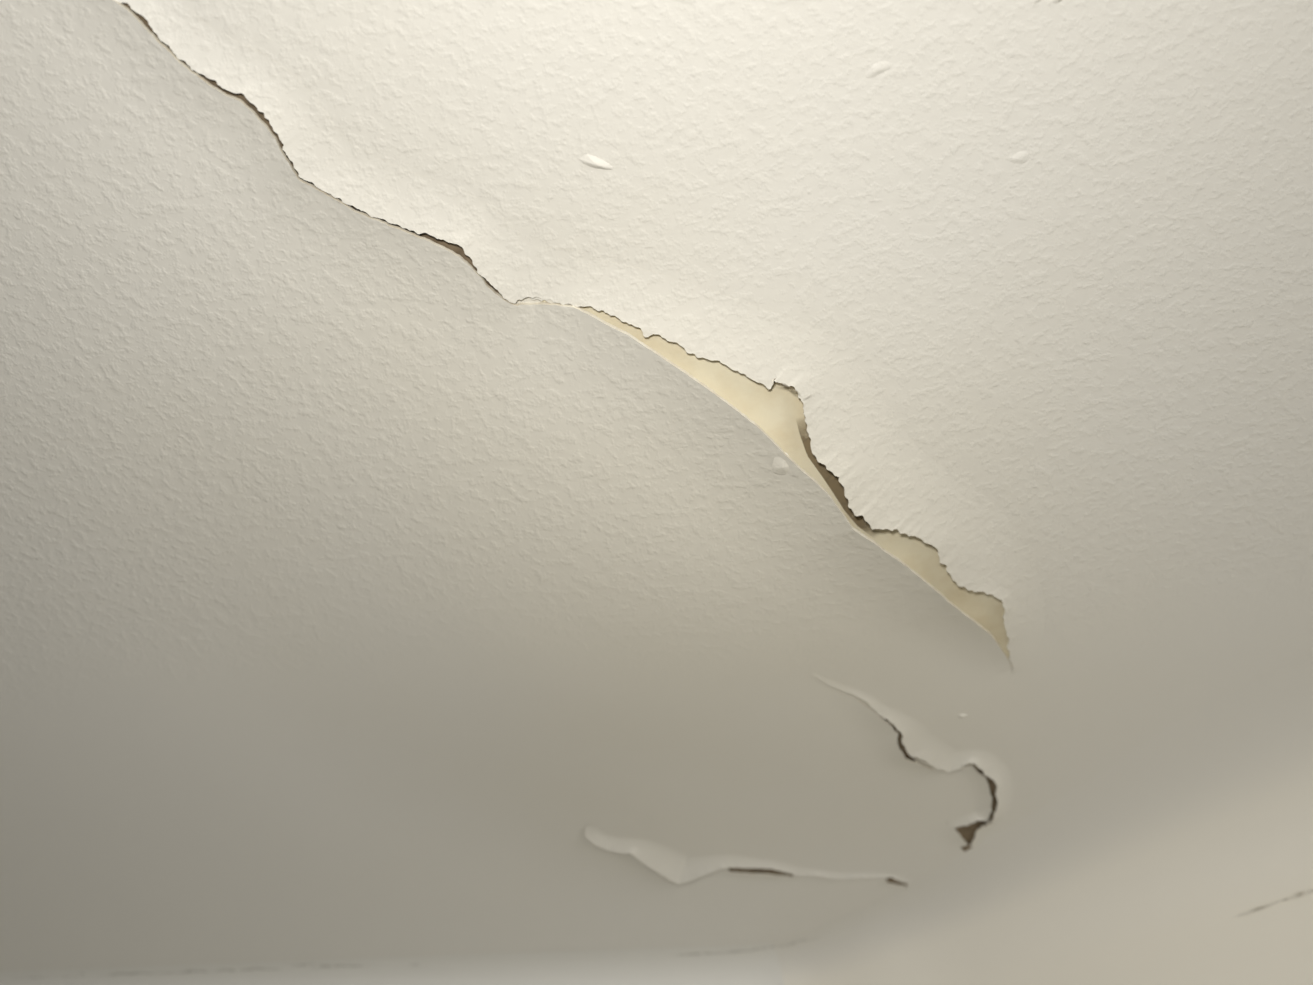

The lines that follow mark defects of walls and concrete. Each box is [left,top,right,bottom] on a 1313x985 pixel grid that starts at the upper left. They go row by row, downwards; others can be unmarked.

peeling [520,258,1045,686]
peeling [584,824,914,890]